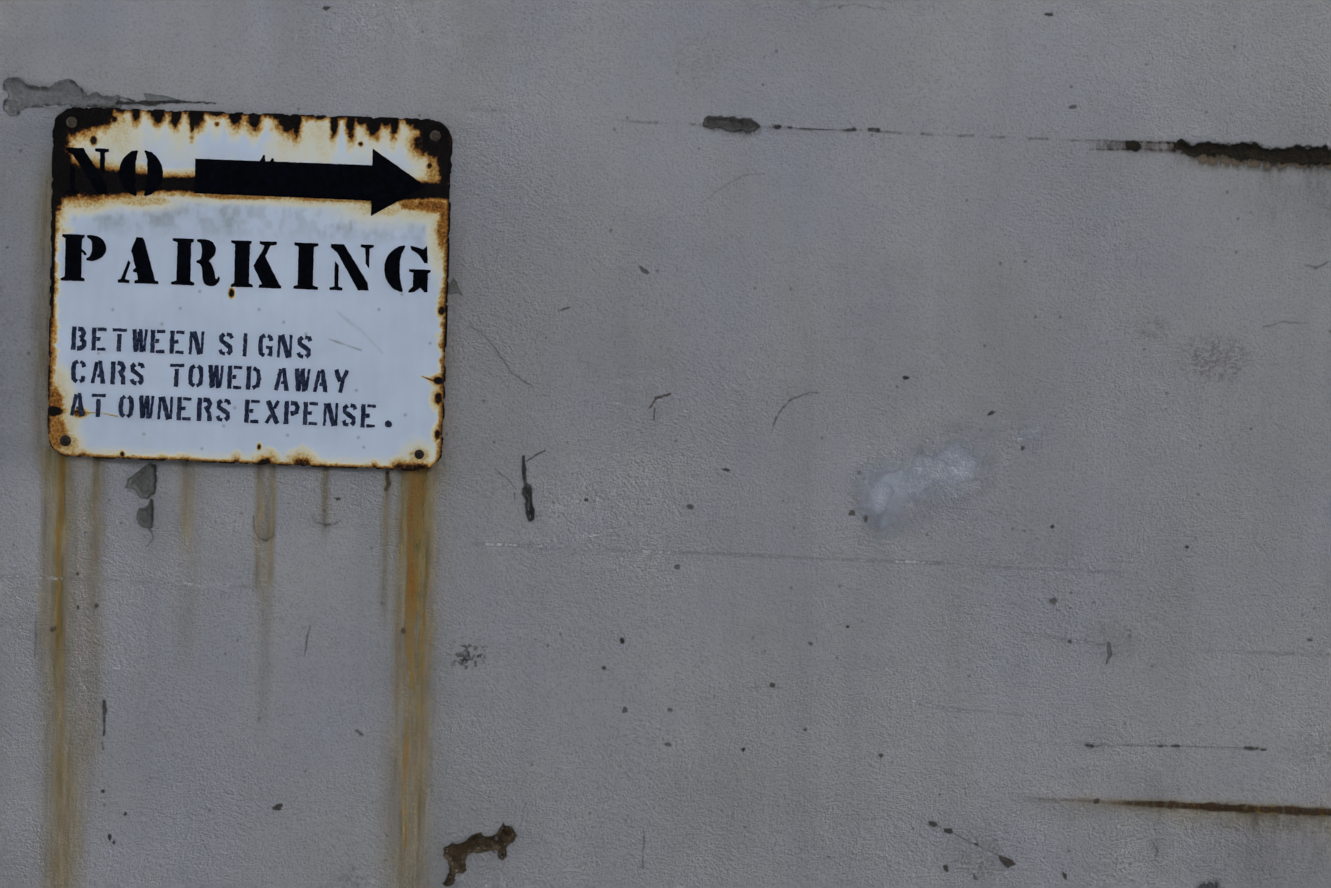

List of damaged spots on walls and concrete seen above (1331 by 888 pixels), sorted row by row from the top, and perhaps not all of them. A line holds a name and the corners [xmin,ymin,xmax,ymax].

crack [774,124,880,132]
corrosion [49,442,66,656]
corrosion [384,469,430,876]
spalling [442,823,517,887]